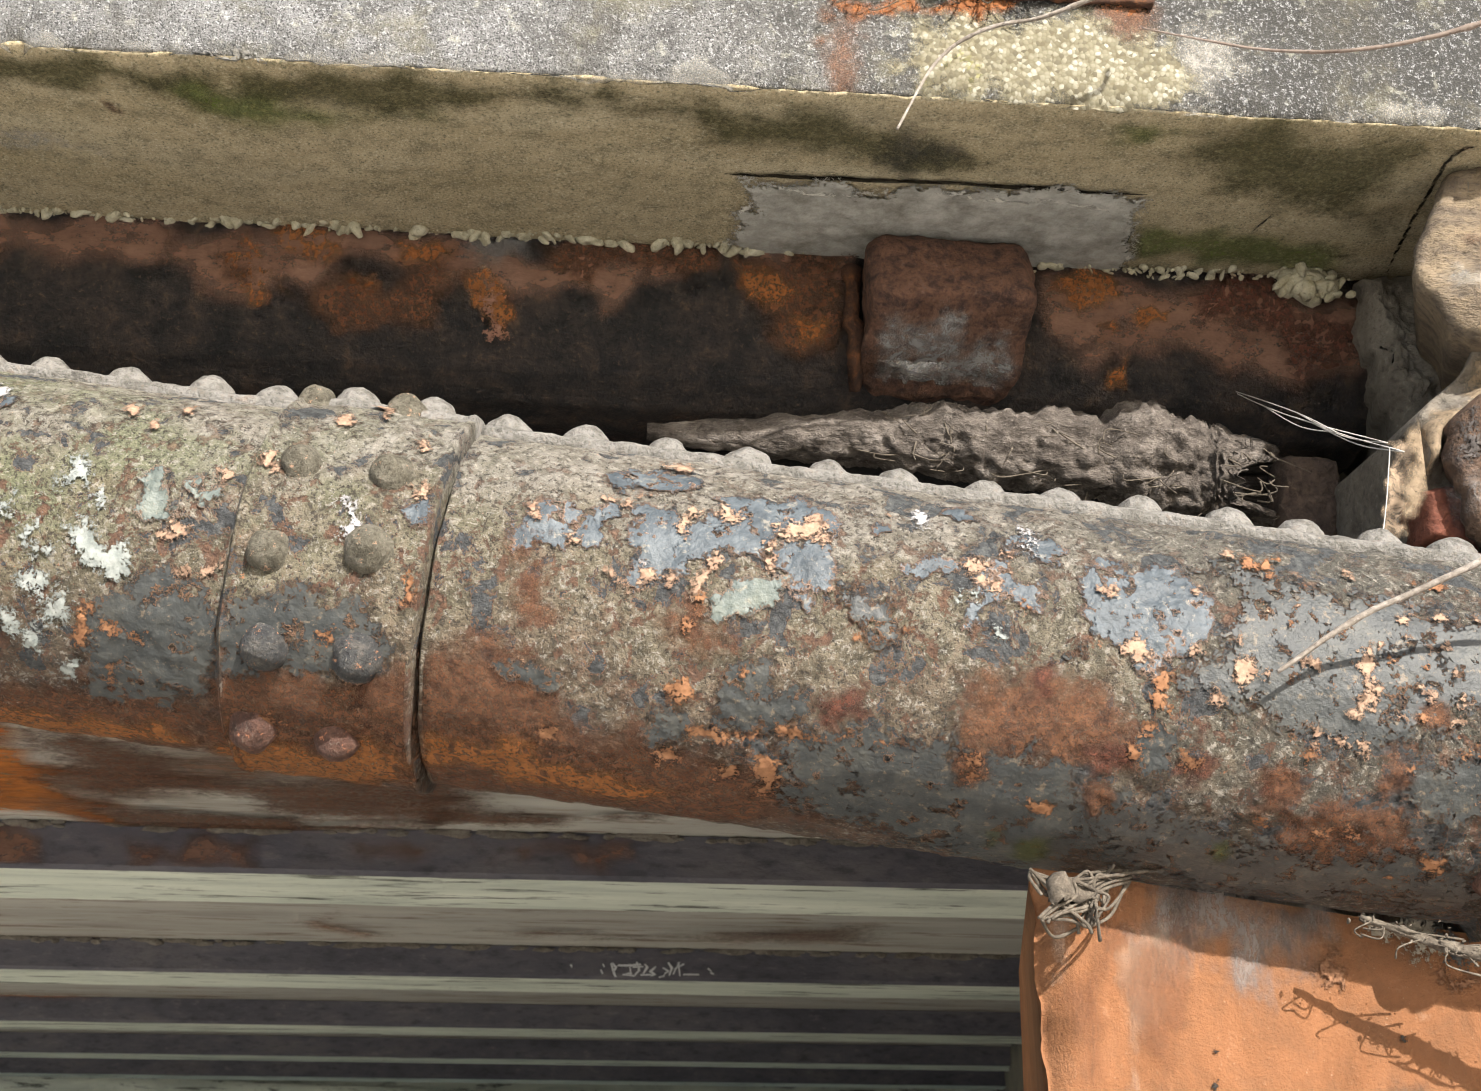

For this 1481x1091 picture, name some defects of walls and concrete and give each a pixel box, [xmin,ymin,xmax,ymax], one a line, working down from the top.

rust [823,0,1155,41]
water stain [555,91,660,112]
water stain [681,100,977,172]
crack [1387,147,1474,272]
rust [0,214,855,360]
rust [1041,268,1361,389]
peeling [256,447,283,475]
peeling [68,455,424,713]
peeling [502,461,920,653]
rust [0,633,833,831]
peeling [638,523,1481,994]
rust [1252,753,1423,894]